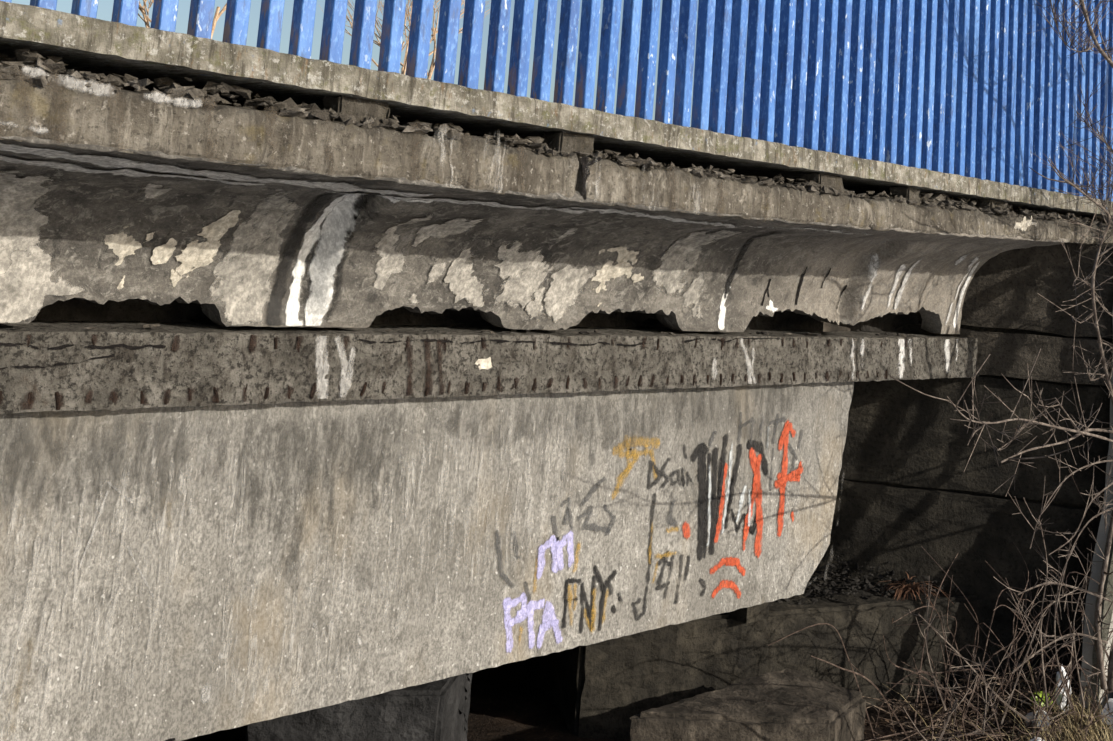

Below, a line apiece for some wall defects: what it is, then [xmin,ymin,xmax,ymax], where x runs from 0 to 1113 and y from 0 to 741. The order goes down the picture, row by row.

peeling [0,171,305,330]
damp [0,104,735,399]
peeling [371,230,741,335]
damp [718,217,780,330]
crack [796,267,847,309]
crack [0,343,166,370]
crack [359,339,646,347]
spalling [745,311,919,337]
damp [945,255,980,372]
corrosion [21,392,35,410]
corrosion [465,377,519,392]
corrosion [584,373,784,389]